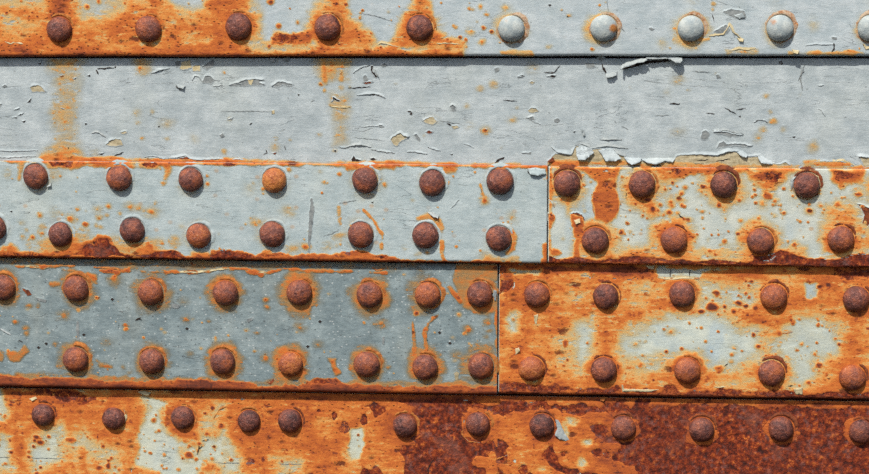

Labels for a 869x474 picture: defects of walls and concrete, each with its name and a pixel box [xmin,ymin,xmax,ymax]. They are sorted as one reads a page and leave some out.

corrosion [478,5,513,45]
peeling [11,82,48,123]
peeling [173,57,216,85]
corrosion [0,0,475,130]
peeling [228,76,300,96]
peeling [362,61,388,98]
peeling [606,56,682,78]
peeling [98,129,128,155]
peeling [378,109,438,147]
peeling [527,128,791,177]
peeling [809,153,869,169]
corrosion [0,129,869,474]